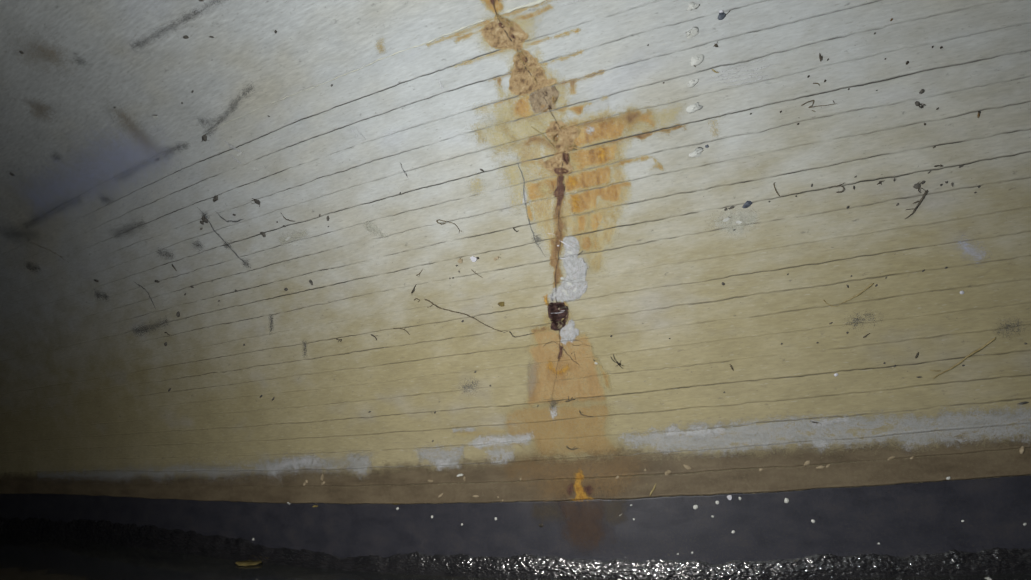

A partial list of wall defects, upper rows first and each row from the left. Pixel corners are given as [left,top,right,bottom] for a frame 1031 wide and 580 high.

rust [426,0,686,277]
crack [517,97,588,394]
water stain [548,233,589,303]
spalling [543,295,573,331]
rust [524,325,614,409]
water stain [560,319,579,344]
water stain [0,401,1031,524]